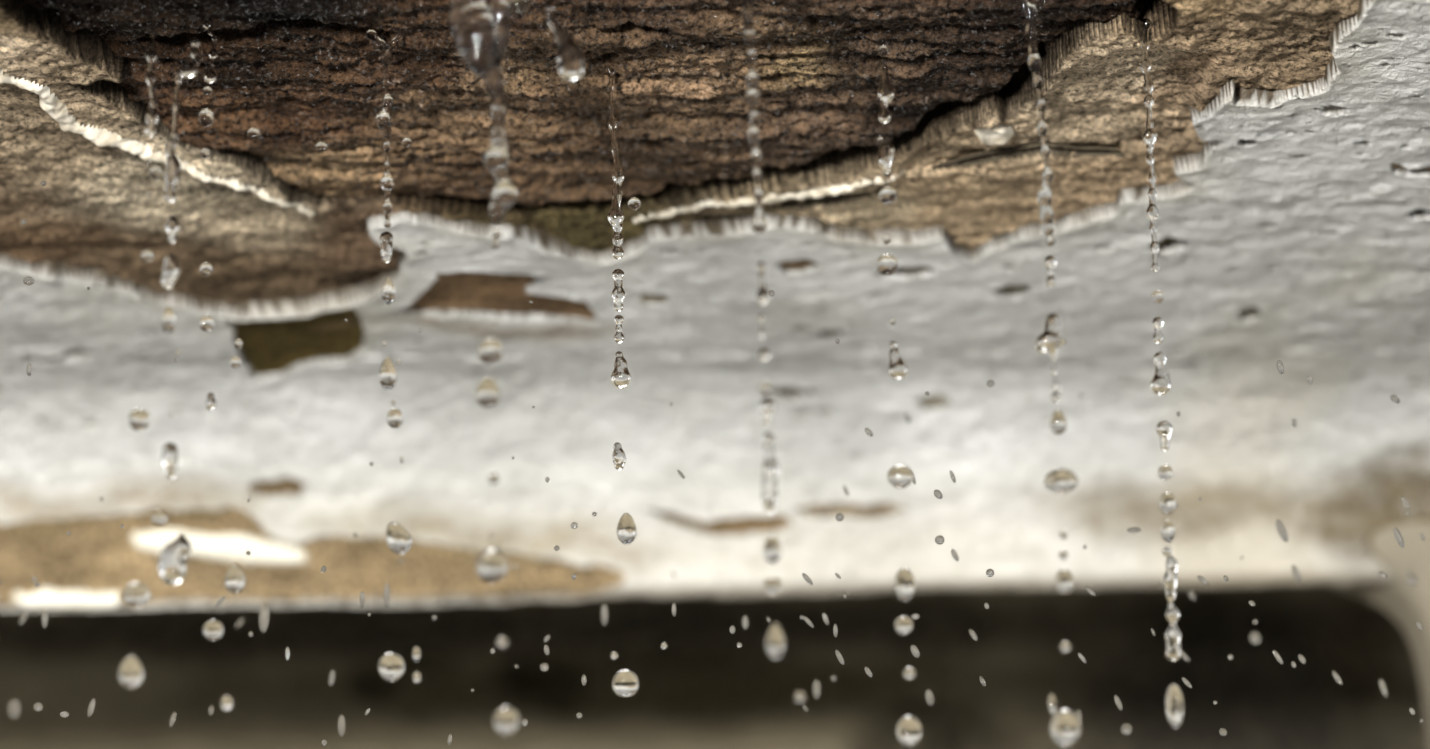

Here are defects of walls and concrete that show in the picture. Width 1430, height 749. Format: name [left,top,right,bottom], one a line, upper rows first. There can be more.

spalling [0,0,1360,376]